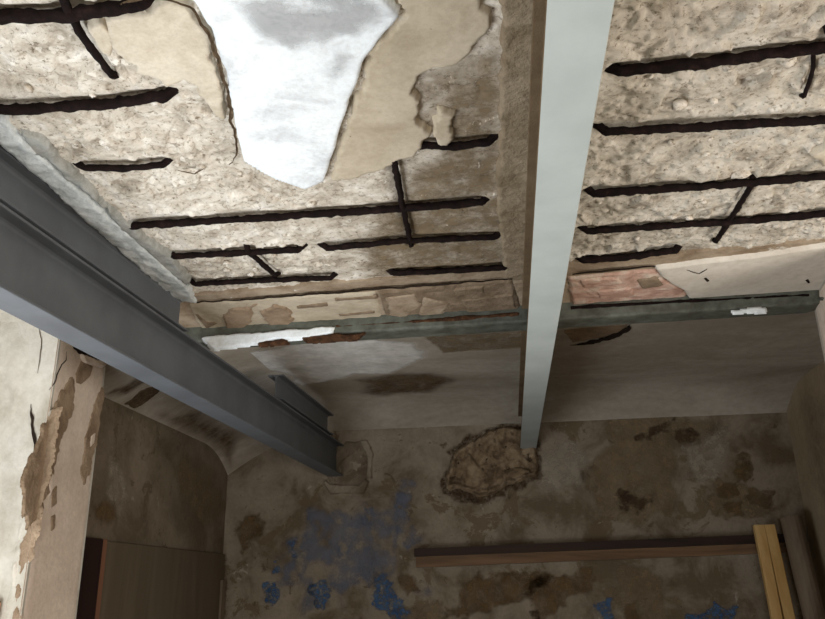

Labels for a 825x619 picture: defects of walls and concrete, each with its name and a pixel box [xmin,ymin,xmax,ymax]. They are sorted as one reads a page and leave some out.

spalling [0,0,521,385]
spalling [568,0,825,304]
crack [29,406,37,448]
crack [38,330,67,390]
peeling [6,347,107,619]
leakage [366,375,445,394]
spalling [441,423,542,503]
leakage [538,417,728,527]